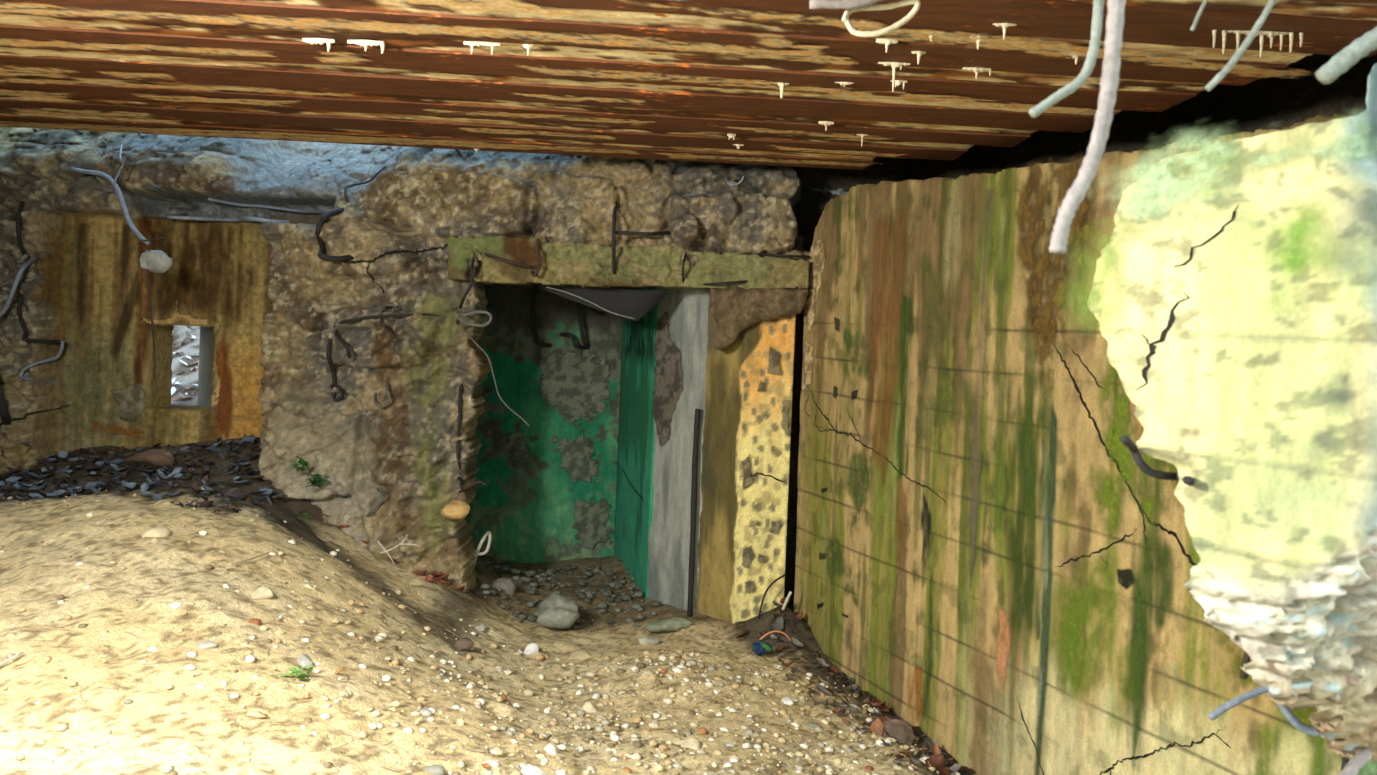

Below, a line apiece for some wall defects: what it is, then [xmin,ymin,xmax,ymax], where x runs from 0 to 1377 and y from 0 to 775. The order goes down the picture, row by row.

damp [1017,163,1093,377]
crack [1136,204,1239,390]
peeling [326,238,614,553]
peeling [653,311,683,446]
crack [1054,345,1196,567]
spalling [1121,396,1194,486]
damp [921,497,931,552]
damp [1036,408,1057,775]
spalling [1117,569,1135,589]
damp [1158,546,1171,626]
crack [1100,727,1230,775]
spalling [1208,651,1324,737]